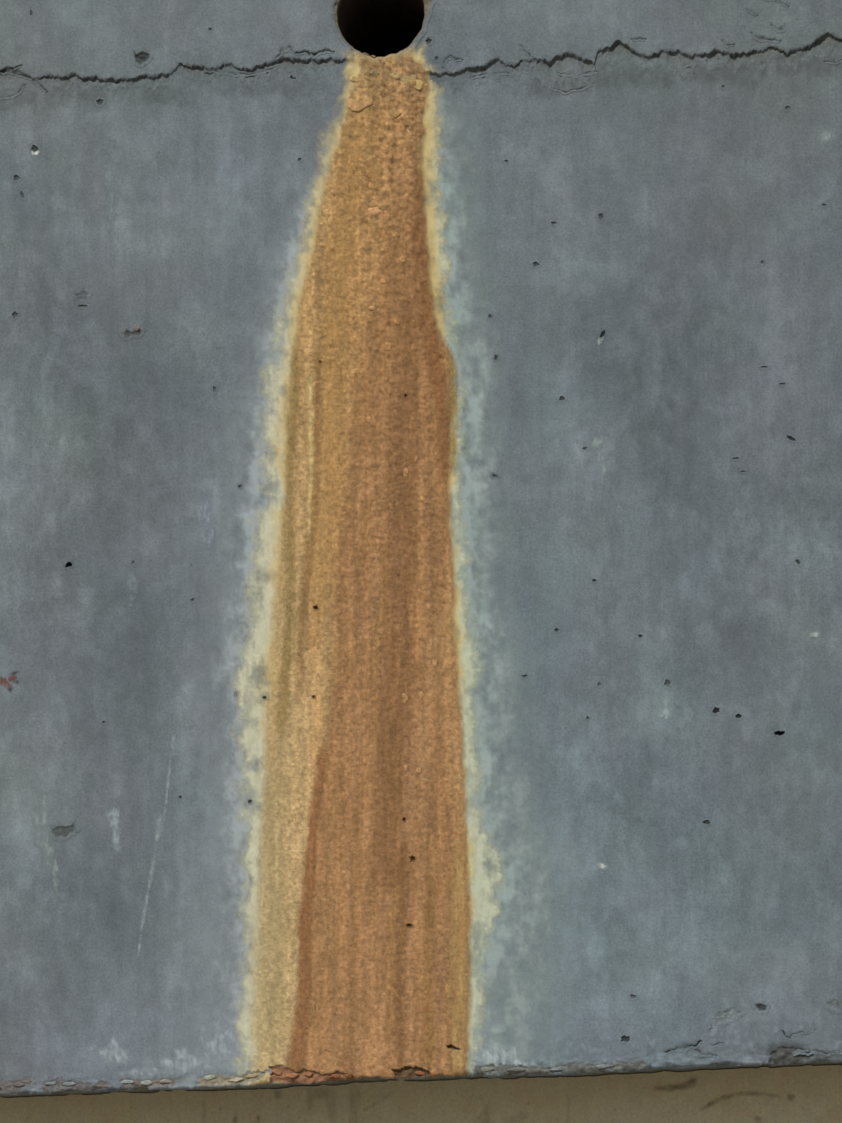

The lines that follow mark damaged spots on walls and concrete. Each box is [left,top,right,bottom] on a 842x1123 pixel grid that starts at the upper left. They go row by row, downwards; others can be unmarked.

crack [428,0,842,96]
crack [0,44,348,100]
rust [234,48,504,1086]
spalling [0,1065,359,1095]
spalling [391,1066,436,1080]
spalling [471,1033,654,1078]
spalling [764,1042,819,1066]